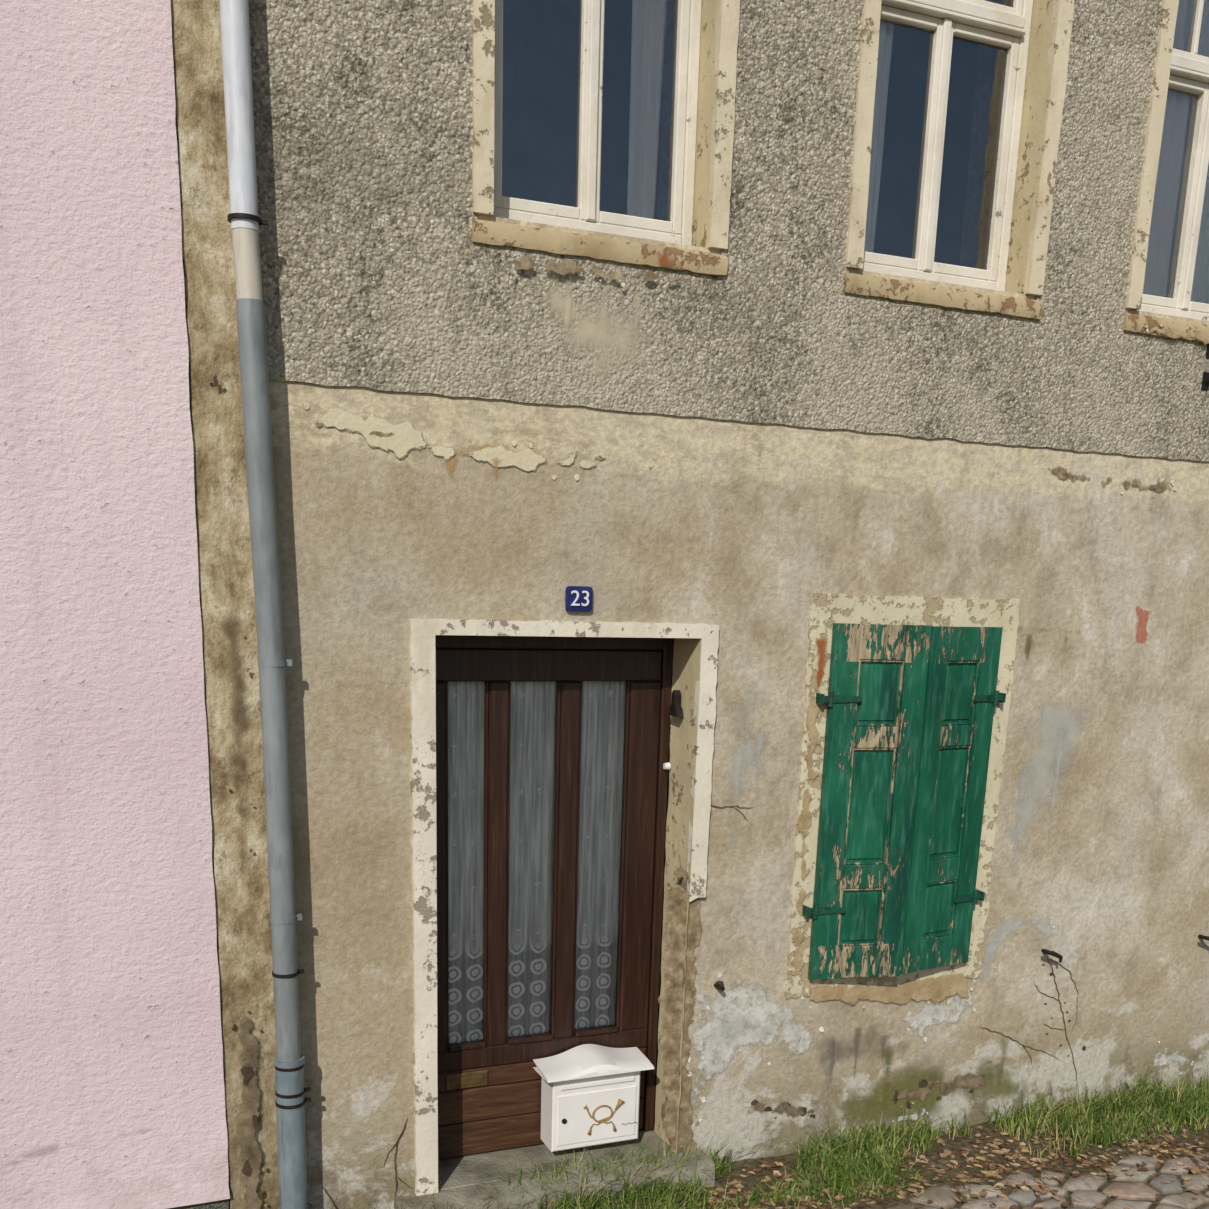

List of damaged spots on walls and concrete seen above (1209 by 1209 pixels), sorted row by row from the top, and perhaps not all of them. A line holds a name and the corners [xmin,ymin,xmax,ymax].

peeling [315,402,606,481]
flaking render [1049,465,1176,494]
flaking render [796,686,820,915]
flaking render [658,857,824,1152]
flaking render [785,917,1055,1042]
flaking render [890,1073,985,1122]